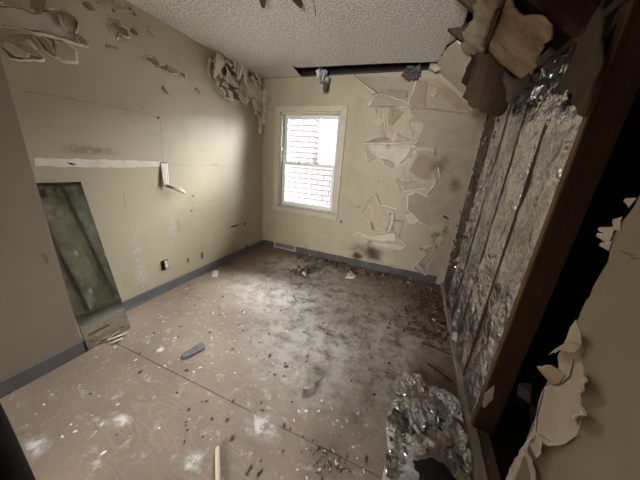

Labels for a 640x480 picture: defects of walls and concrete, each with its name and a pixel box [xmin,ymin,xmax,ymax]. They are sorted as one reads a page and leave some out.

peeling [0,0,89,65]
peeling [105,7,139,49]
peeling [143,56,186,78]
peeling [207,51,267,134]
peeling [352,74,482,279]
spalling [596,216,623,251]
peeling [505,320,588,480]